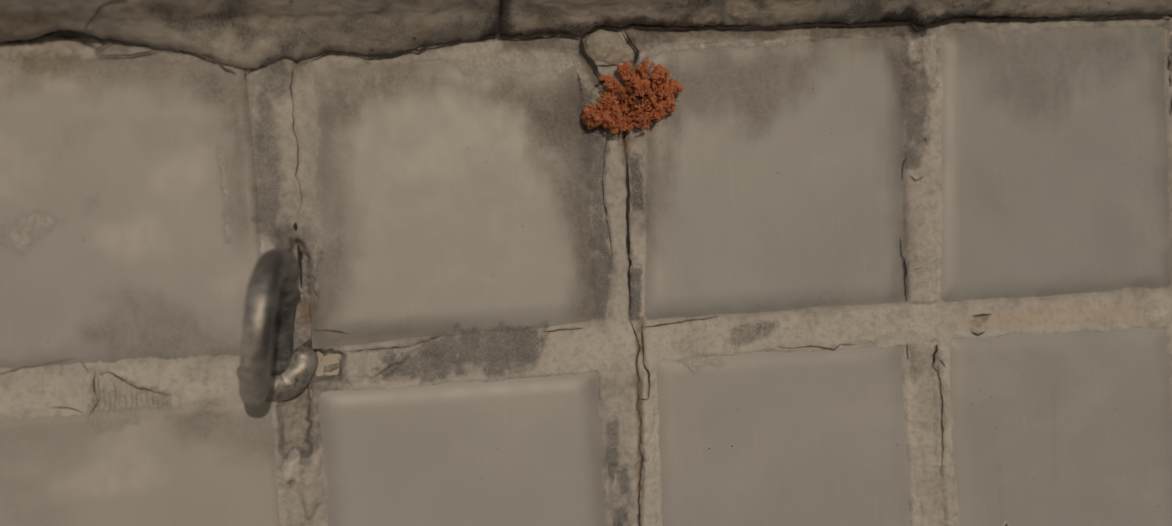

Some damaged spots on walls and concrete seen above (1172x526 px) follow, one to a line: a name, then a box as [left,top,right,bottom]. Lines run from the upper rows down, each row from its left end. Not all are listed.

crack [0,0,1172,289]
crack [602,114,718,526]
crack [900,240,922,300]
crack [971,314,991,336]